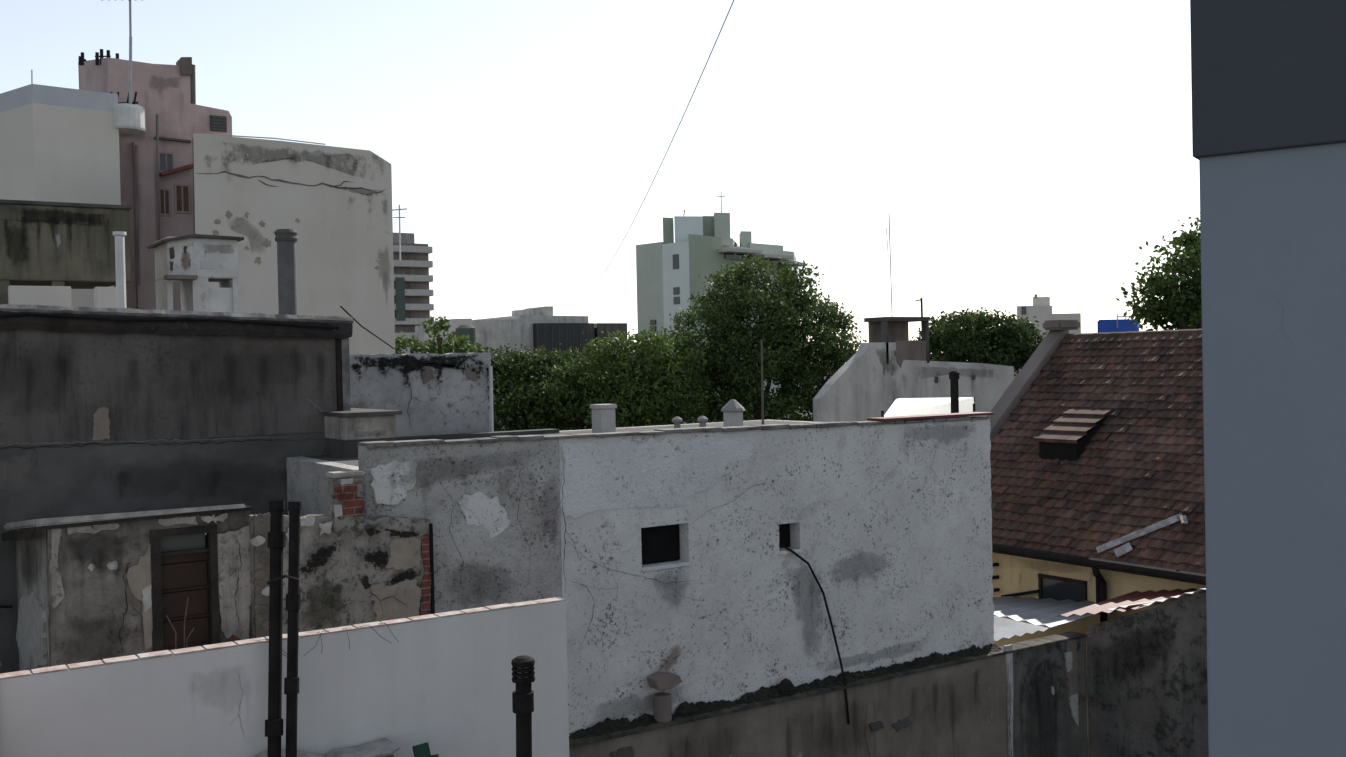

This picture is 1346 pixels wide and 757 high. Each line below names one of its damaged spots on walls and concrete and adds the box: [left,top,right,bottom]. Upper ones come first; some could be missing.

crack [198,171,388,195]
peeling [213,210,276,265]
water stain [351,354,489,410]
spalling [286,460,418,543]
spalling [458,491,511,538]
peeling [16,523,120,670]
peeling [87,544,153,650]
peeling [157,513,251,640]
peeling [370,534,431,622]